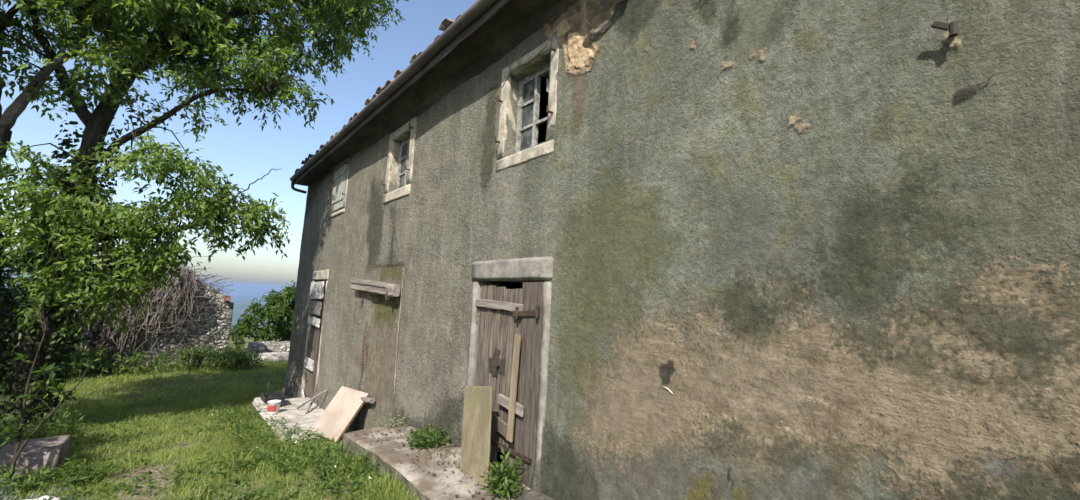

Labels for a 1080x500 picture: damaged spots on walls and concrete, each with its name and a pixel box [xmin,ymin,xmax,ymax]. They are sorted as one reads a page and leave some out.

flaking render [544,0,623,75]
damp [722,0,784,58]
damp [480,87,497,190]
flaking render [788,113,810,133]